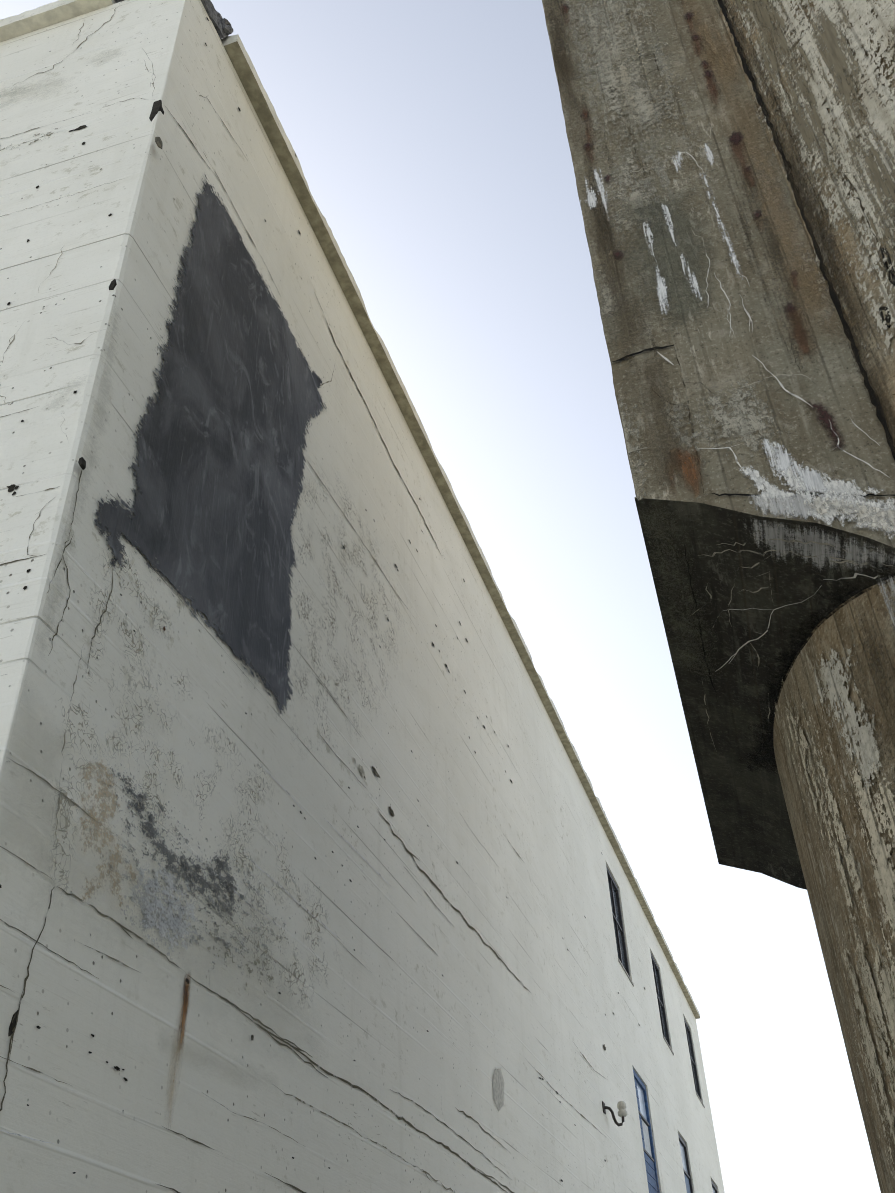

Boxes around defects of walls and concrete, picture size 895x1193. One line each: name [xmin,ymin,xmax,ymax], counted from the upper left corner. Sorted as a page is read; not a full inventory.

crack [27,8,116,79]
peeling [593,265,625,319]
peeling [552,0,718,251]
leakage [643,222,669,313]
leakage [662,204,702,300]
corrosion [729,132,754,185]
peeling [712,0,895,395]
leakage [730,0,895,274]
crack [314,292,441,554]
leakage [740,439,895,626]
crack [0,455,531,1193]
corrosion [180,978,189,1046]